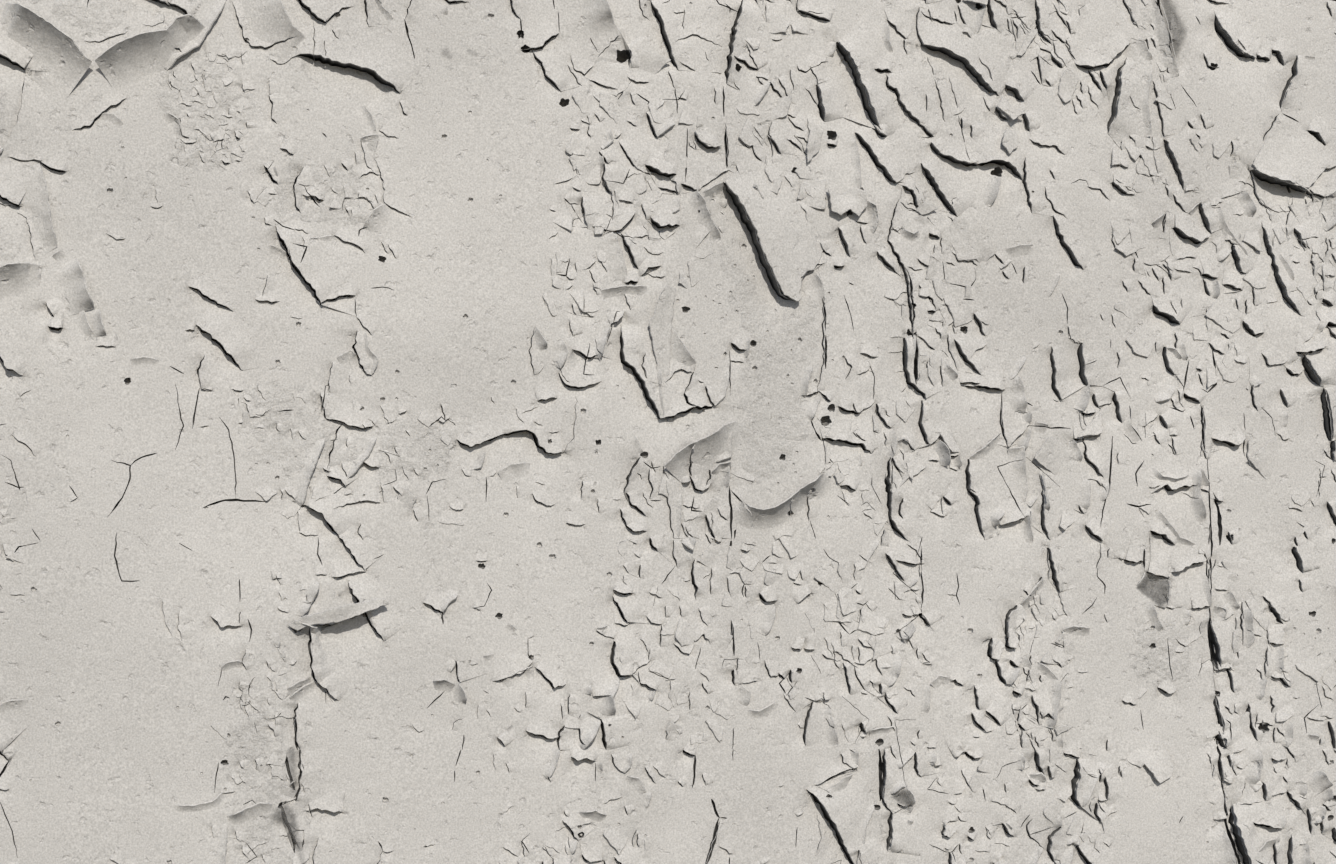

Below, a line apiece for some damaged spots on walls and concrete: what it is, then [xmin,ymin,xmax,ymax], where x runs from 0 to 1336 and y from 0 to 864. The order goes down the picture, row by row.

peeling [0,424,43,525]
peeling [109,453,156,515]
peeling [175,270,281,450]
spalling [503,0,1336,864]
crack [1243,367,1336,546]
crack [1122,459,1293,864]
spalling [227,812,295,864]
peeling [377,840,393,864]